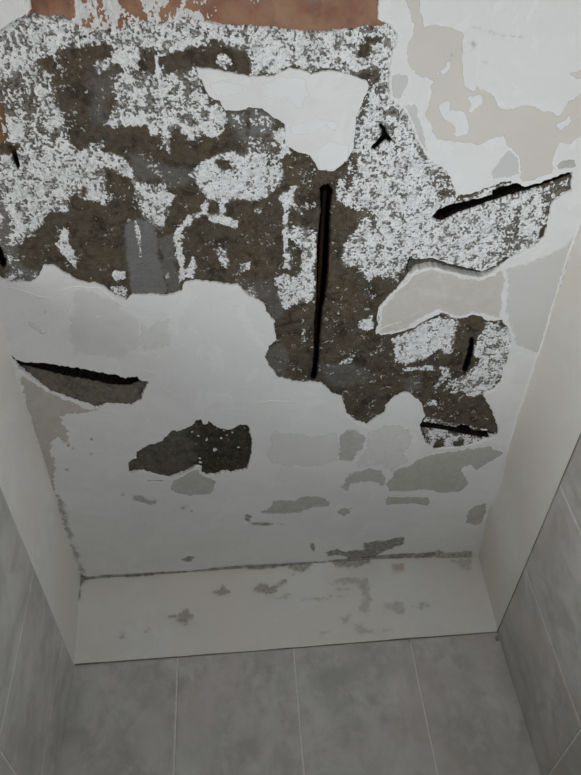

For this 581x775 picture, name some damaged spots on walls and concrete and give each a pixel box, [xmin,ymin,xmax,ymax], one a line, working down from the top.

crack [433,172,571,220]
crack [0,247,8,267]
spalling [0,0,581,505]
crack [311,184,333,379]
crack [13,357,140,385]
crack [420,422,494,437]
crack [75,433,581,666]